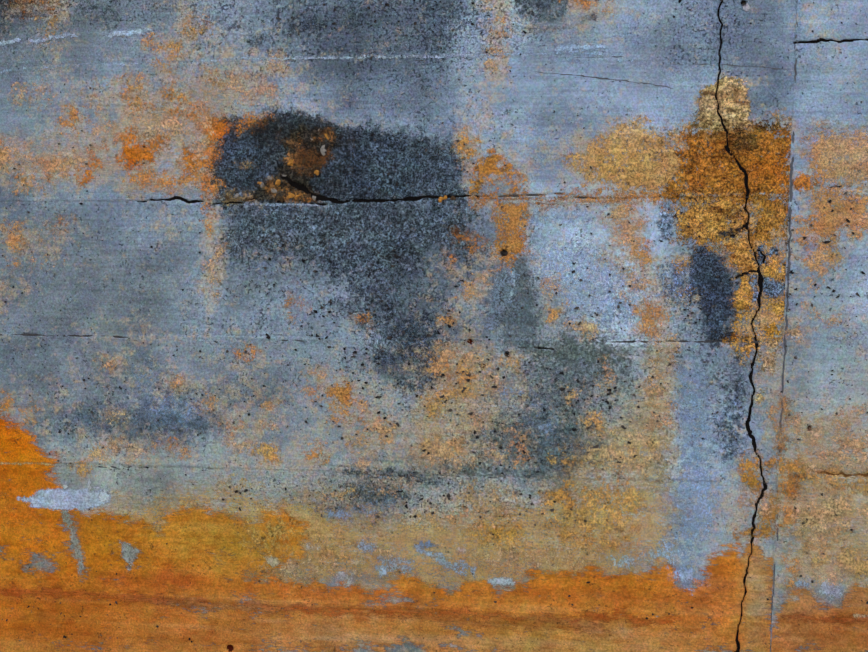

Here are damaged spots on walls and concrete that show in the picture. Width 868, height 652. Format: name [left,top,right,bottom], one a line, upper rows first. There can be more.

corrosion [0,217,26,266]
corrosion [0,14,287,237]
crack [137,175,479,206]
water stain [205,105,489,397]
corrosion [0,291,868,652]
water stain [316,236,640,524]
crack [535,71,673,89]
corrosion [451,76,868,375]
water stain [607,246,754,591]
crack [690,0,781,652]
water stain [747,245,785,301]
crack [794,37,868,45]